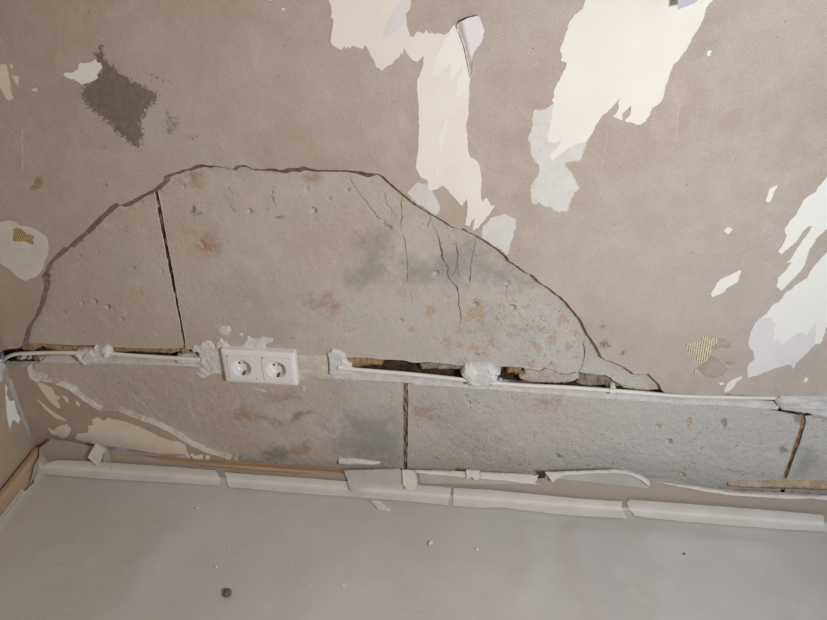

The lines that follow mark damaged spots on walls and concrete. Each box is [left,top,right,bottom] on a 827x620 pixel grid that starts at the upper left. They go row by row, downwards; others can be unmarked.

damp [82,45,157,147]
crack [349,175,412,297]
crack [427,216,476,317]
spalling [9,164,827,495]
crack [526,343,585,375]